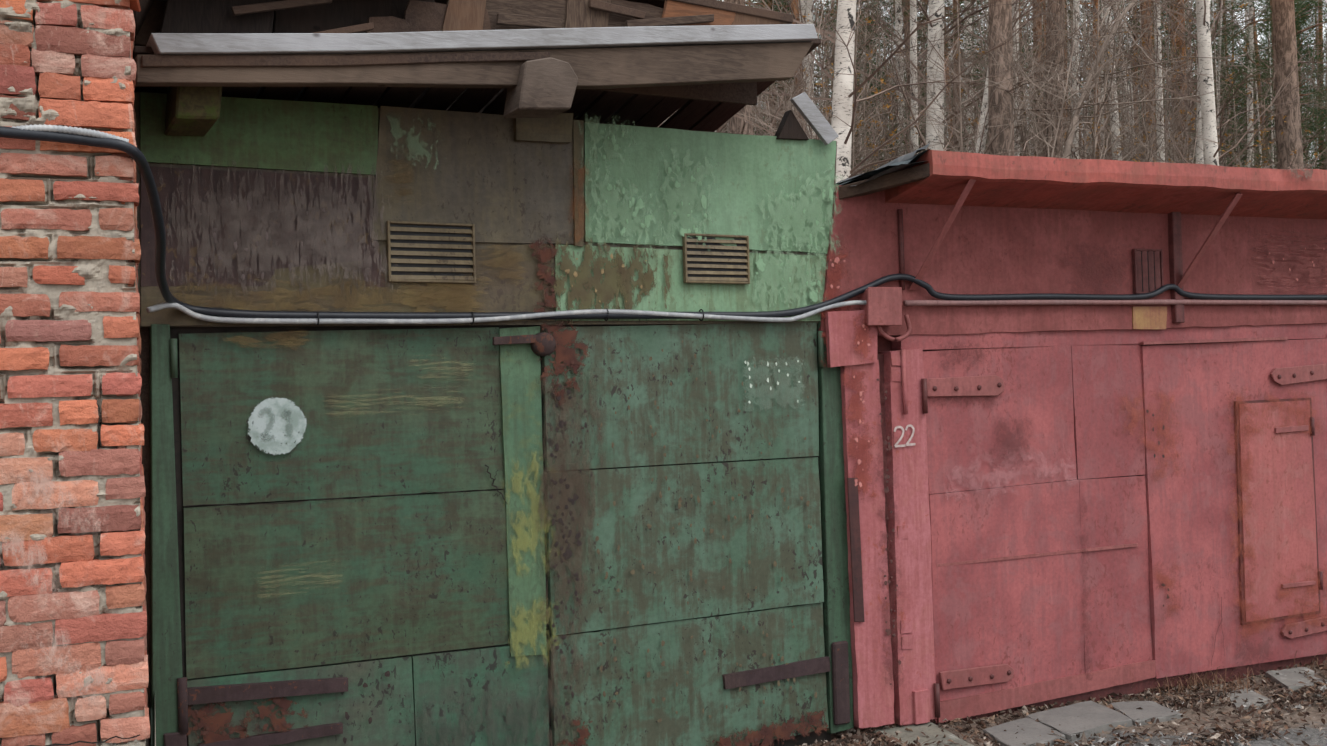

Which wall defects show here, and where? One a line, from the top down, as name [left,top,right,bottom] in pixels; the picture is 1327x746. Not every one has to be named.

corrosion [706,709,829,746]